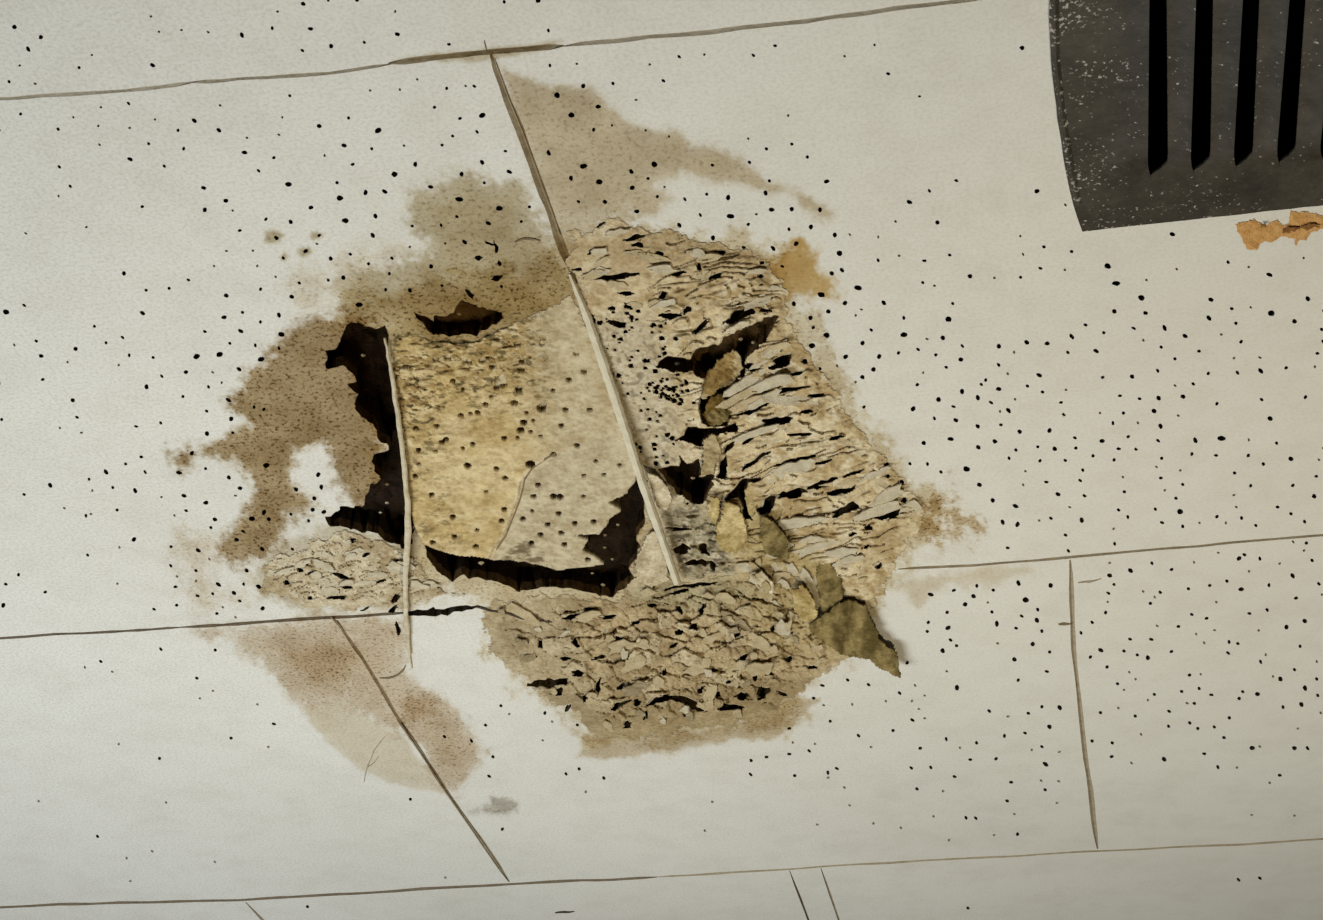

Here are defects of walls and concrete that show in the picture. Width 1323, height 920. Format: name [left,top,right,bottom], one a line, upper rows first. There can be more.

damp [383,191,566,345]
corrosion [1236,211,1323,250]
damp [205,291,405,559]
spalling [481,218,924,742]
spalling [257,530,465,612]